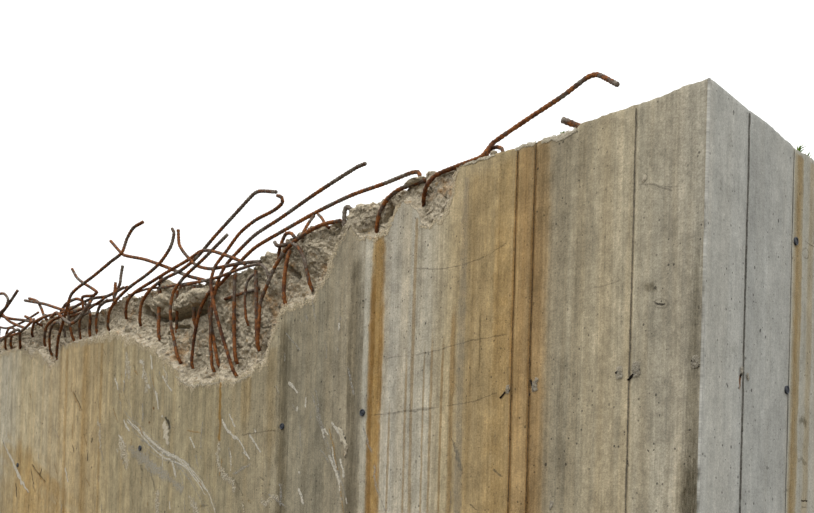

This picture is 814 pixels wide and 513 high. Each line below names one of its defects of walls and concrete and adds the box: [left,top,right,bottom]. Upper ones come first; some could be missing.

spalling [0,72,620,393]